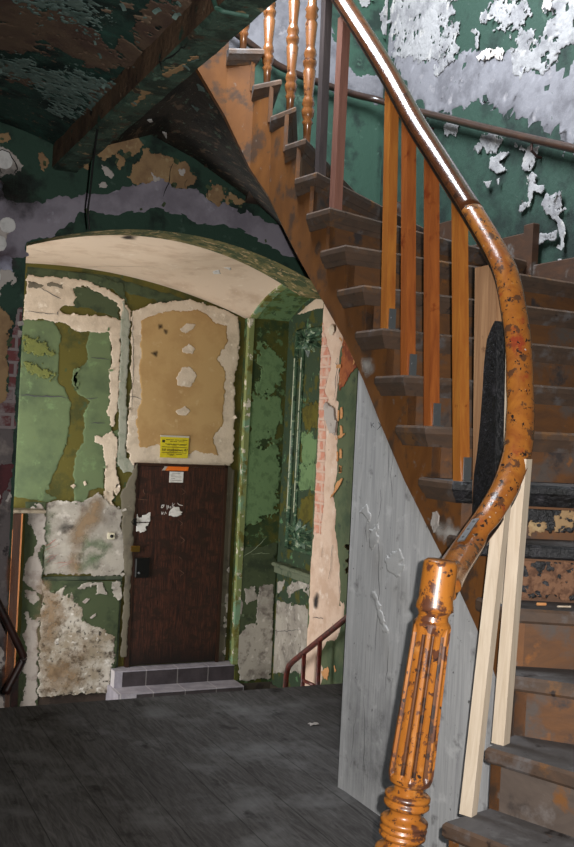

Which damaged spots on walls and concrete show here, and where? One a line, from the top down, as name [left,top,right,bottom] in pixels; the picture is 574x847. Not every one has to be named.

peeling [0,0,192,120]
peeling [162,56,199,78]
peeling [379,0,574,157]
peeling [98,138,197,189]
peeling [206,180,245,208]
peeling [474,133,566,260]
peeling [28,272,127,320]
peeling [0,306,138,708]
flaking render [219,464,234,661]
flaking render [238,304,372,686]
peeling [521,560,574,601]
peeling [528,510,574,536]